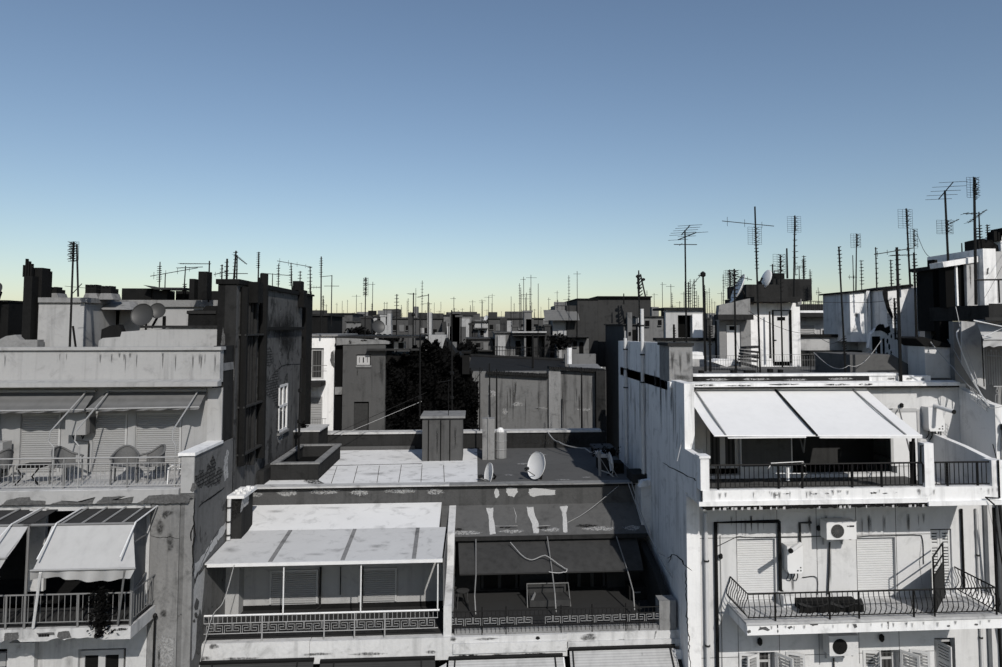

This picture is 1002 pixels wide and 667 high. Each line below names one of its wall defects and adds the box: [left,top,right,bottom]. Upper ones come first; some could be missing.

peeling [1,331,235,506]